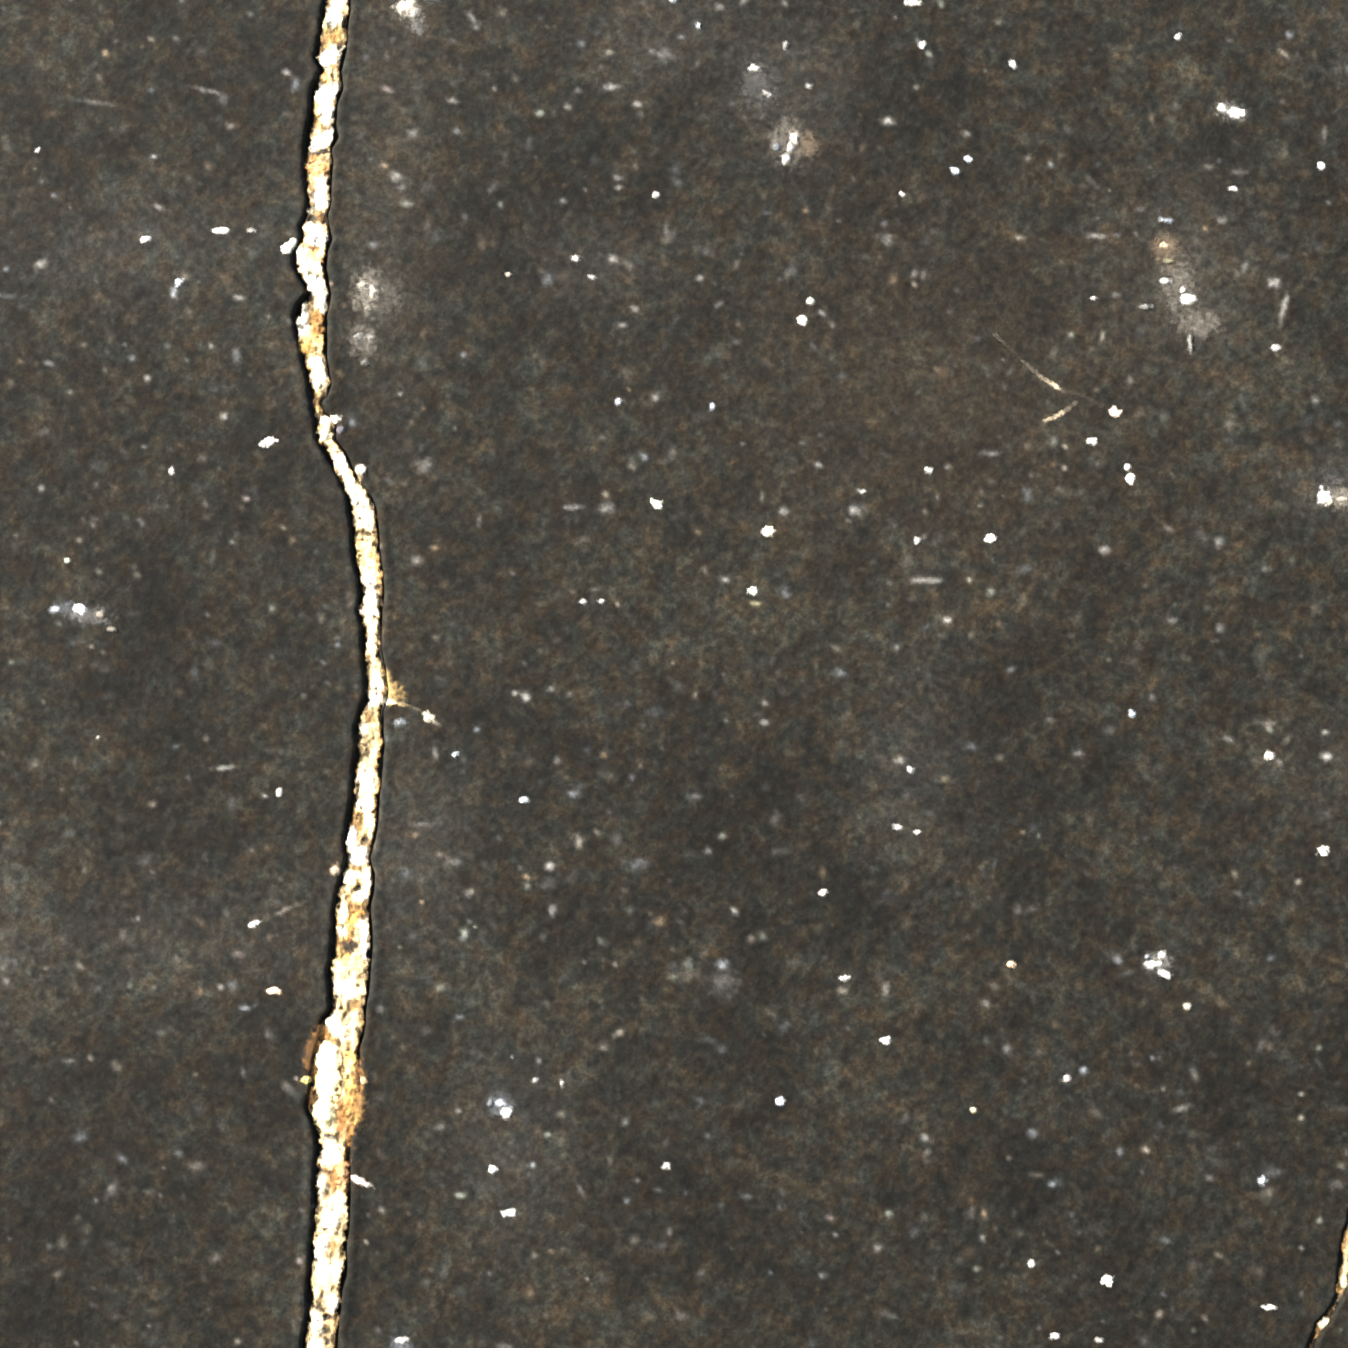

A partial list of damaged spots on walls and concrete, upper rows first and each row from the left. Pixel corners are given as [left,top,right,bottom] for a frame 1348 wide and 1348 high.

crack [282,0,438,1348]
crack [1319,1232,1348,1329]